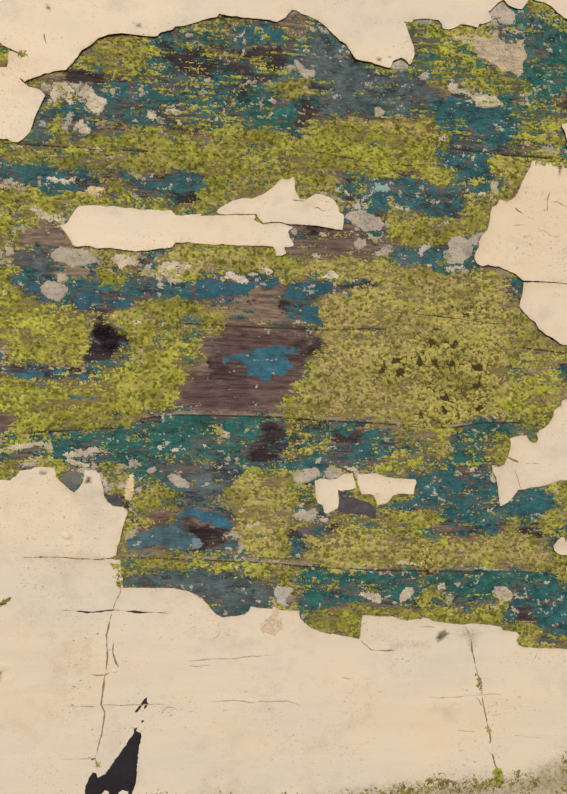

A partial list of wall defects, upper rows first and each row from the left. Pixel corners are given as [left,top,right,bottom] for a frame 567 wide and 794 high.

peeling [0,0,567,149]
peeling [60,177,344,262]
peeling [198,263,289,282]
peeling [474,153,567,345]
peeling [11,301,219,420]
peeling [492,399,567,506]
crack [63,557,178,765]
crack [189,655,267,667]
crack [215,699,300,707]
peeling [0,459,567,794]
crack [430,627,502,768]
crack [440,568,550,576]